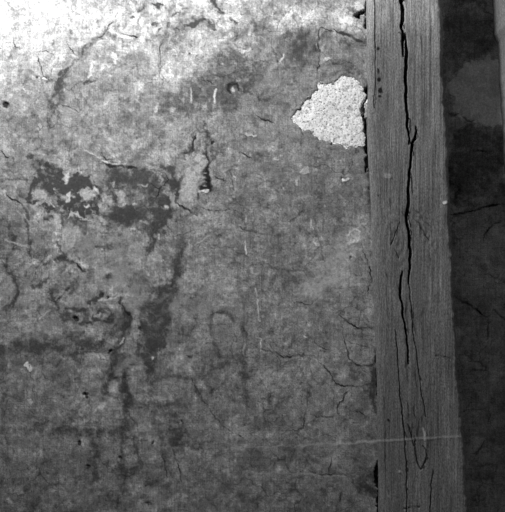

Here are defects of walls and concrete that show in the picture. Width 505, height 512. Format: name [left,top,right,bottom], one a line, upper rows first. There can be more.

crack [315,26,376,68]
spalling [291,75,368,149]
water stain [25,154,185,256]
crack [395,0,426,416]
water stain [137,250,182,373]
crack [289,338,348,431]
crack [399,389,434,512]